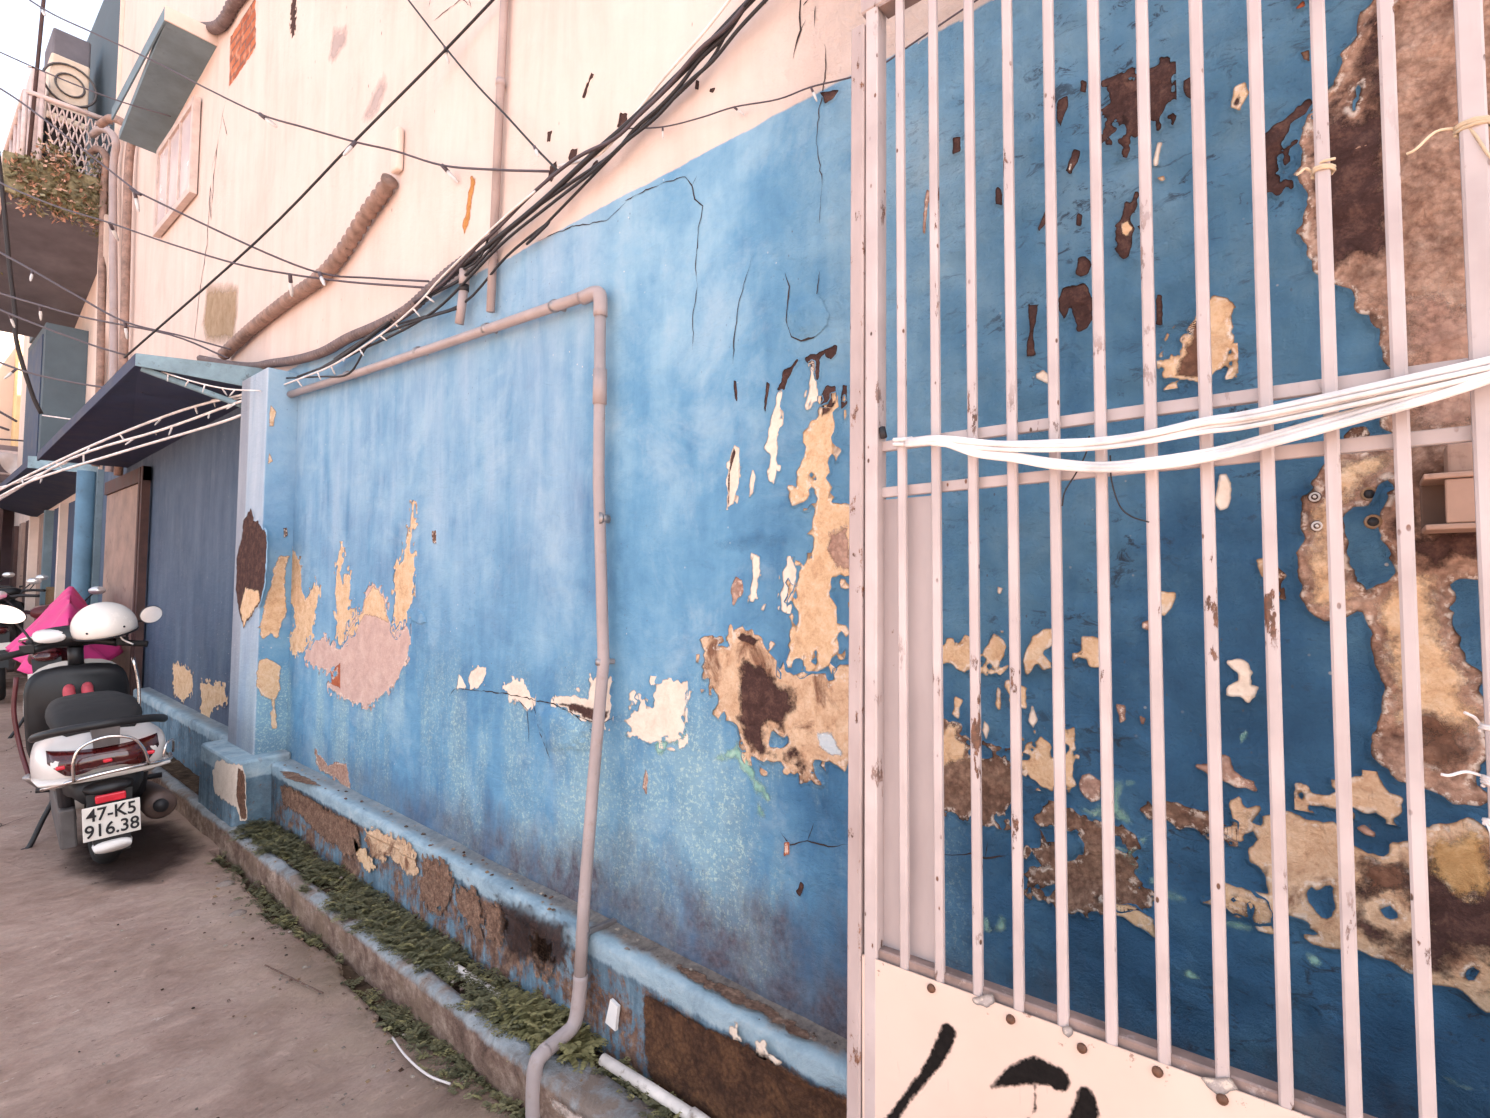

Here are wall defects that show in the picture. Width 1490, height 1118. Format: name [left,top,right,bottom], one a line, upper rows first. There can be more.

crack [539,176,703,349]
crack [733,258,752,355]
crack [785,272,820,342]
peeling [1055,54,1191,184]
peeling [1155,293,1243,392]
spalling [1265,0,1469,370]
peeling [236,498,437,729]
peeling [456,343,849,789]
spalling [212,759,247,821]
spalling [280,747,509,952]
peeling [642,767,650,795]
spalling [943,391,1490,1017]